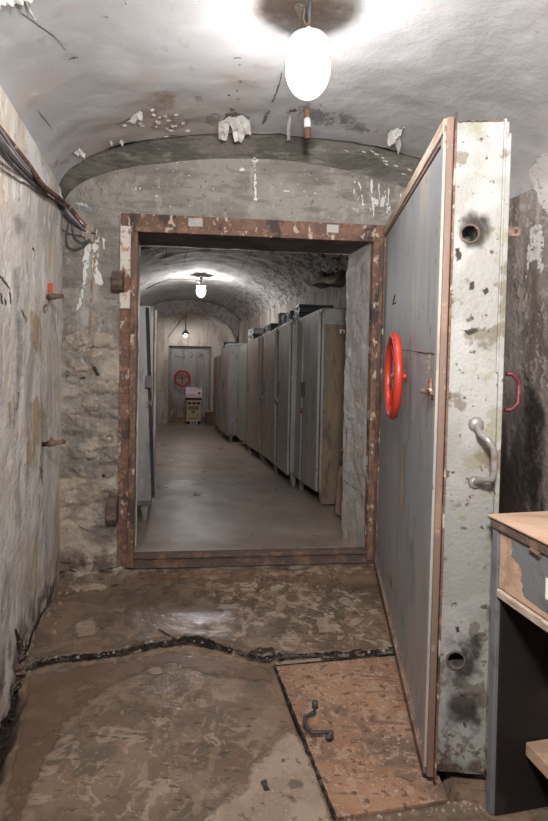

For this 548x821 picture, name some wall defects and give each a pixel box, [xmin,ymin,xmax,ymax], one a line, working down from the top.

flaking render [0,0,53,36]
flaking render [116,109,190,137]
peeling [528,151,548,213]
peeling [525,224,545,278]
leakage [524,377,545,501]
crack [15,608,395,671]